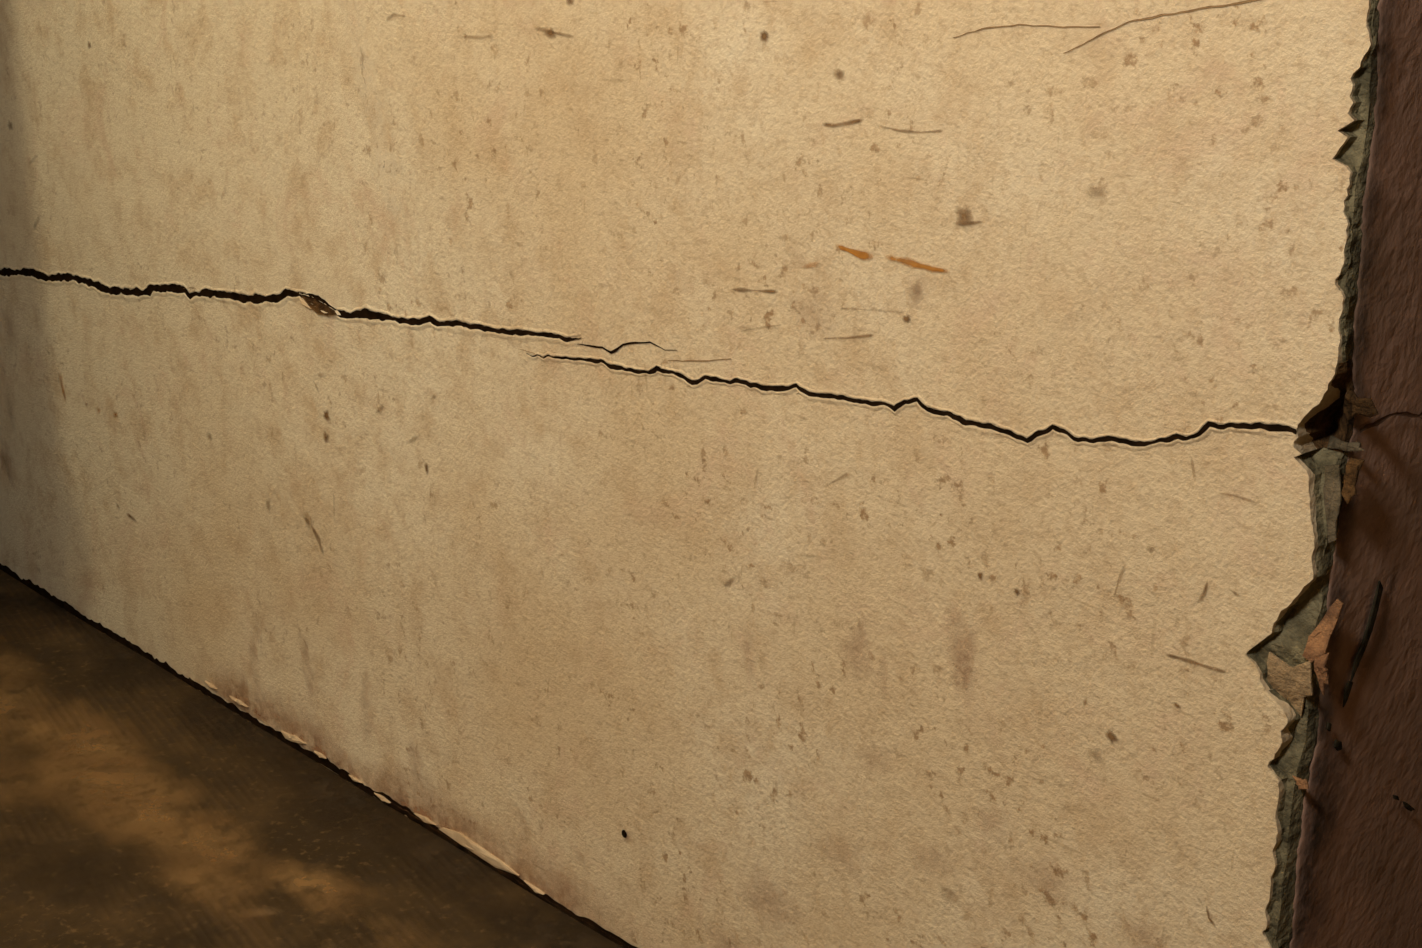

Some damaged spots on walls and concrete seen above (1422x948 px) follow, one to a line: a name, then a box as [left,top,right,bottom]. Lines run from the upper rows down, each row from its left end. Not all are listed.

crack [0,264,1298,452]
flaking render [1247,0,1383,948]
crack [1359,412,1422,433]